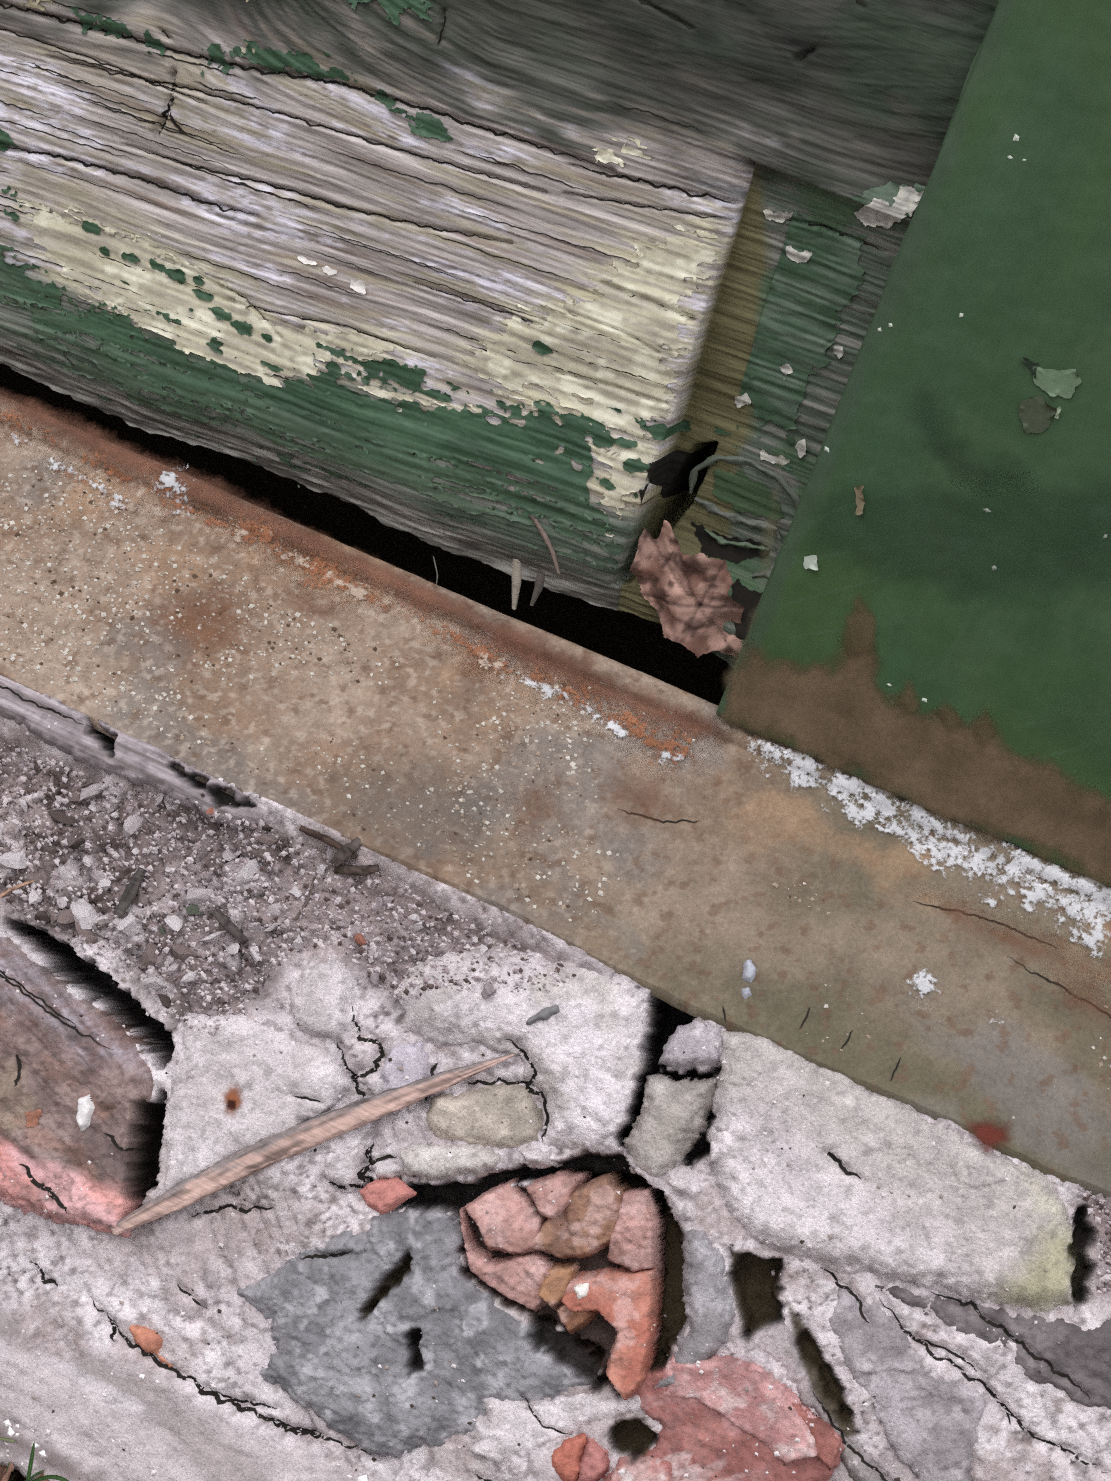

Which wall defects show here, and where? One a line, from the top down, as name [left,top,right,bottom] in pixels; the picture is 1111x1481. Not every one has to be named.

peeling [1018,357,1082,434]
peeling [154,465,191,515]
peeling [231,518,370,600]
corrosion [0,394,715,769]
peeling [803,555,818,570]
peeling [519,678,628,741]
peeling [747,737,1111,958]
peeling [907,969,940,998]
spalling [76,1094,95,1131]
spalling [574,1283,589,1299]
crack [32,1262,371,1455]
crack [820,1267,1106,1473]